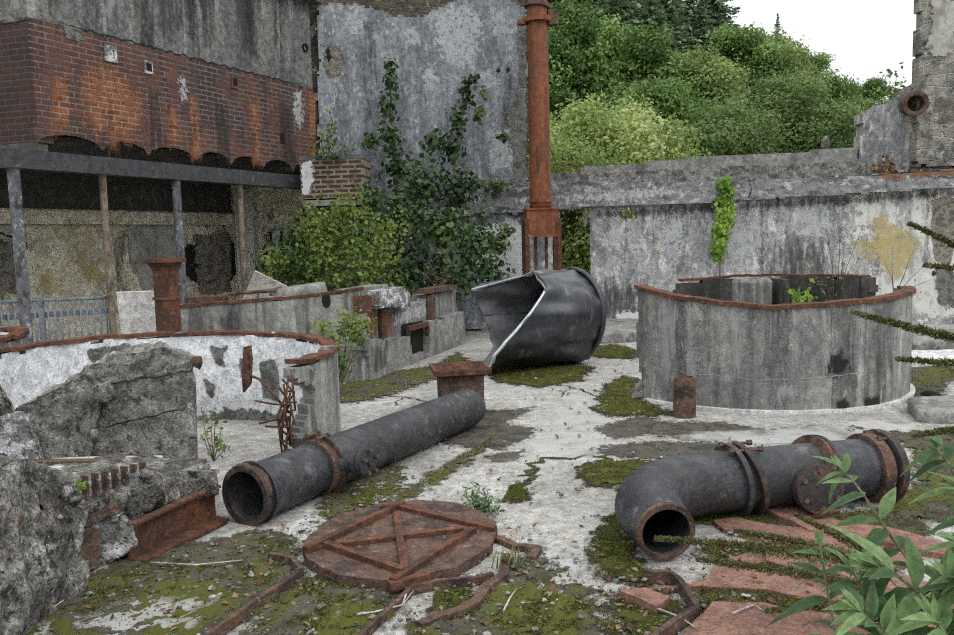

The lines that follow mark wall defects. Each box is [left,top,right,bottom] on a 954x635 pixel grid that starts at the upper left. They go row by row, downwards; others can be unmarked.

flaking render [924,0,954,57]
corrosion [52,77,71,128]
corrosion [81,62,142,146]
corrosion [189,96,202,157]
corrosion [249,100,261,163]
water stain [558,186,681,233]
water stain [765,192,950,279]
peeling [87,342,131,363]
peeling [210,345,228,367]
spalling [259,359,279,401]
water stain [659,301,694,381]
water stain [823,339,850,379]